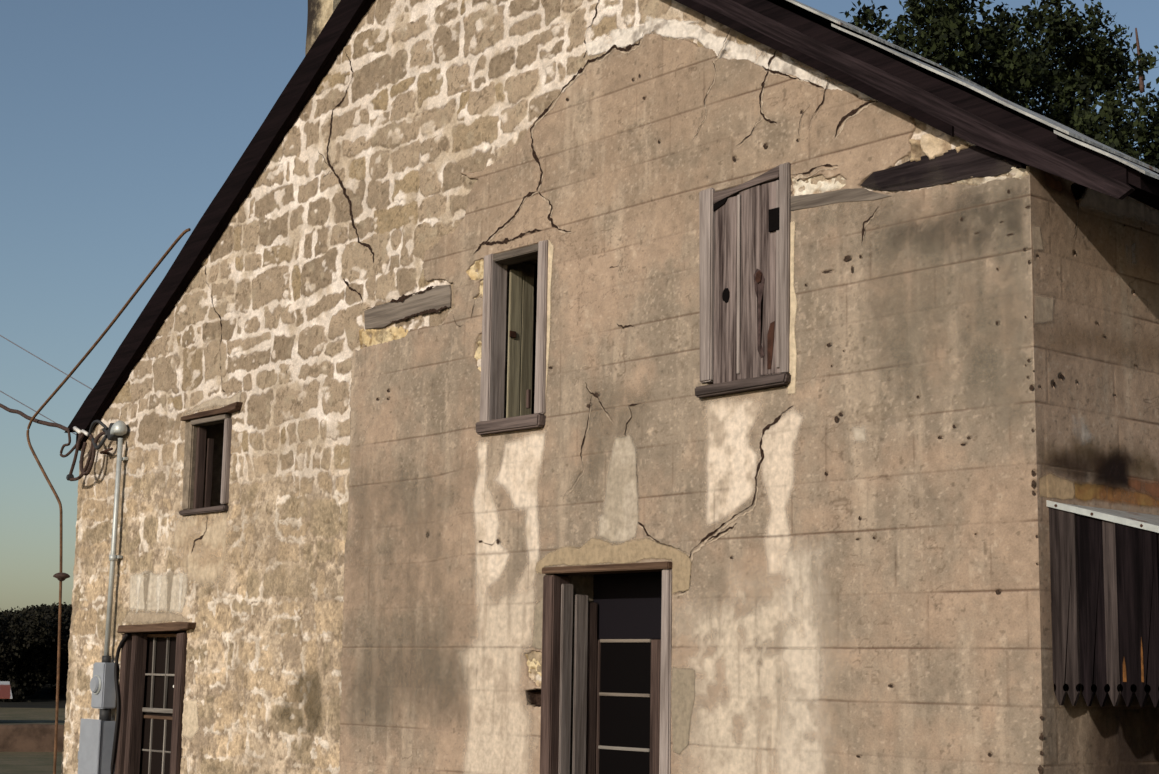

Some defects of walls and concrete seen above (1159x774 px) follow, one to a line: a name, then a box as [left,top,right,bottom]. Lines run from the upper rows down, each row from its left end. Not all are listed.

crack [319,52,374,262]
crack [475,0,645,252]
crack [736,50,876,180]
spalling [792,177,846,196]
spalling [952,166,1030,194]
leakage [460,433,545,774]
crack [563,382,638,499]
crack [637,405,795,598]
leakage [690,400,823,774]
rust [1075,478,1159,507]